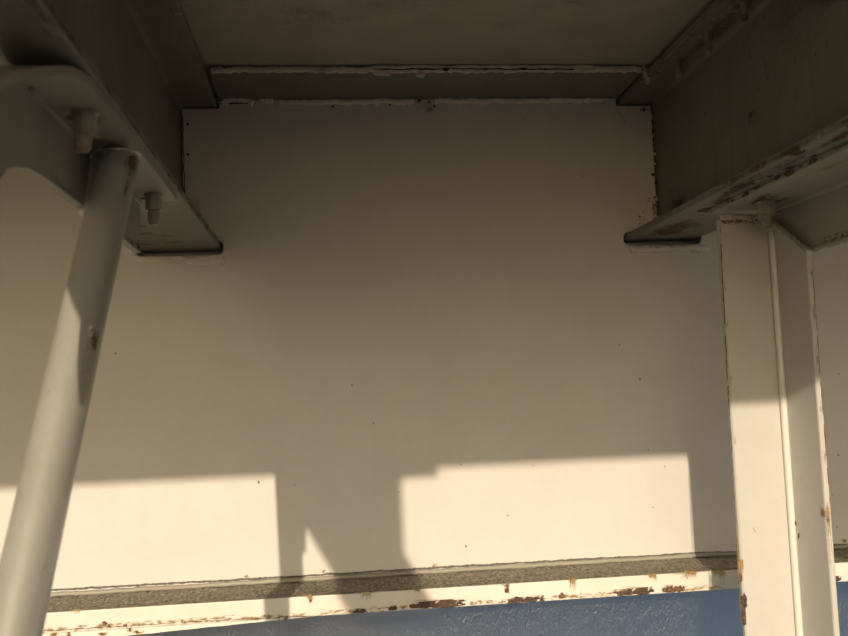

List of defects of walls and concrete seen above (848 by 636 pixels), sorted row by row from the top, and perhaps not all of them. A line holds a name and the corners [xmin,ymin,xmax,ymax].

rust [725,335,748,625]
rust [378,574,722,611]
rust [47,613,325,636]